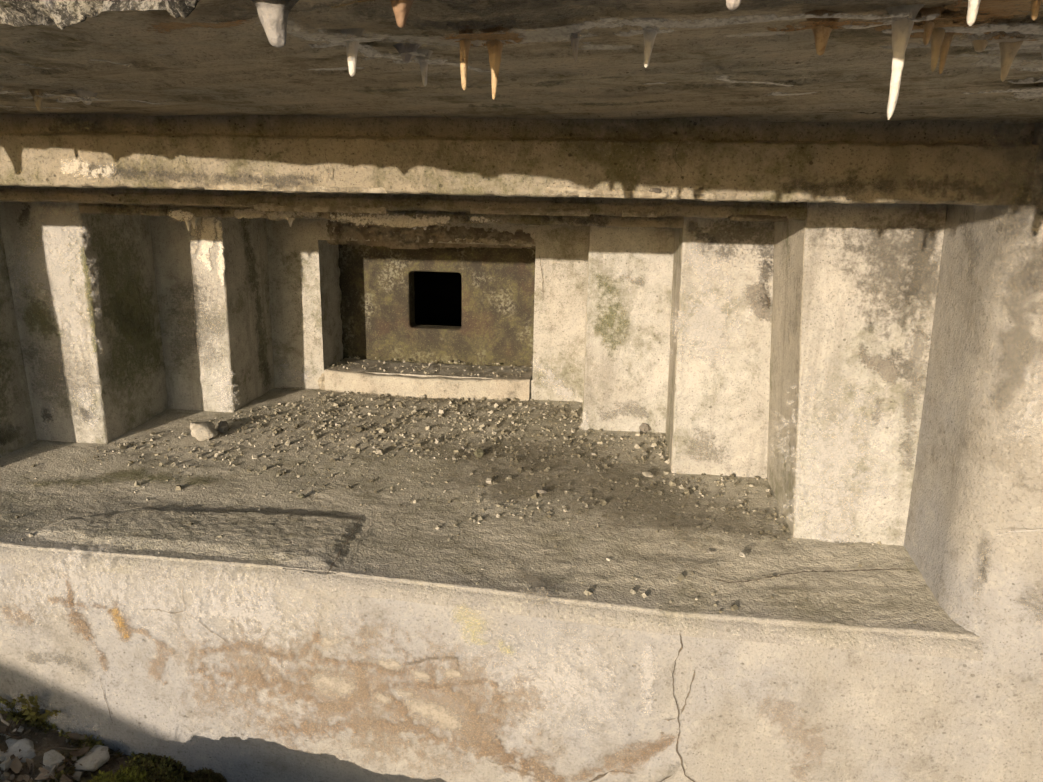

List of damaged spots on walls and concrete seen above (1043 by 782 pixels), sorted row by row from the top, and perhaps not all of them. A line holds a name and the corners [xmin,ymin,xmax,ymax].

rust [912,0,1043,30]
water stain [287,0,909,73]
water stain [716,75,816,96]
crack [683,544,900,583]
water stain [0,555,670,782]
crack [660,635,695,782]
crack [589,771,633,782]